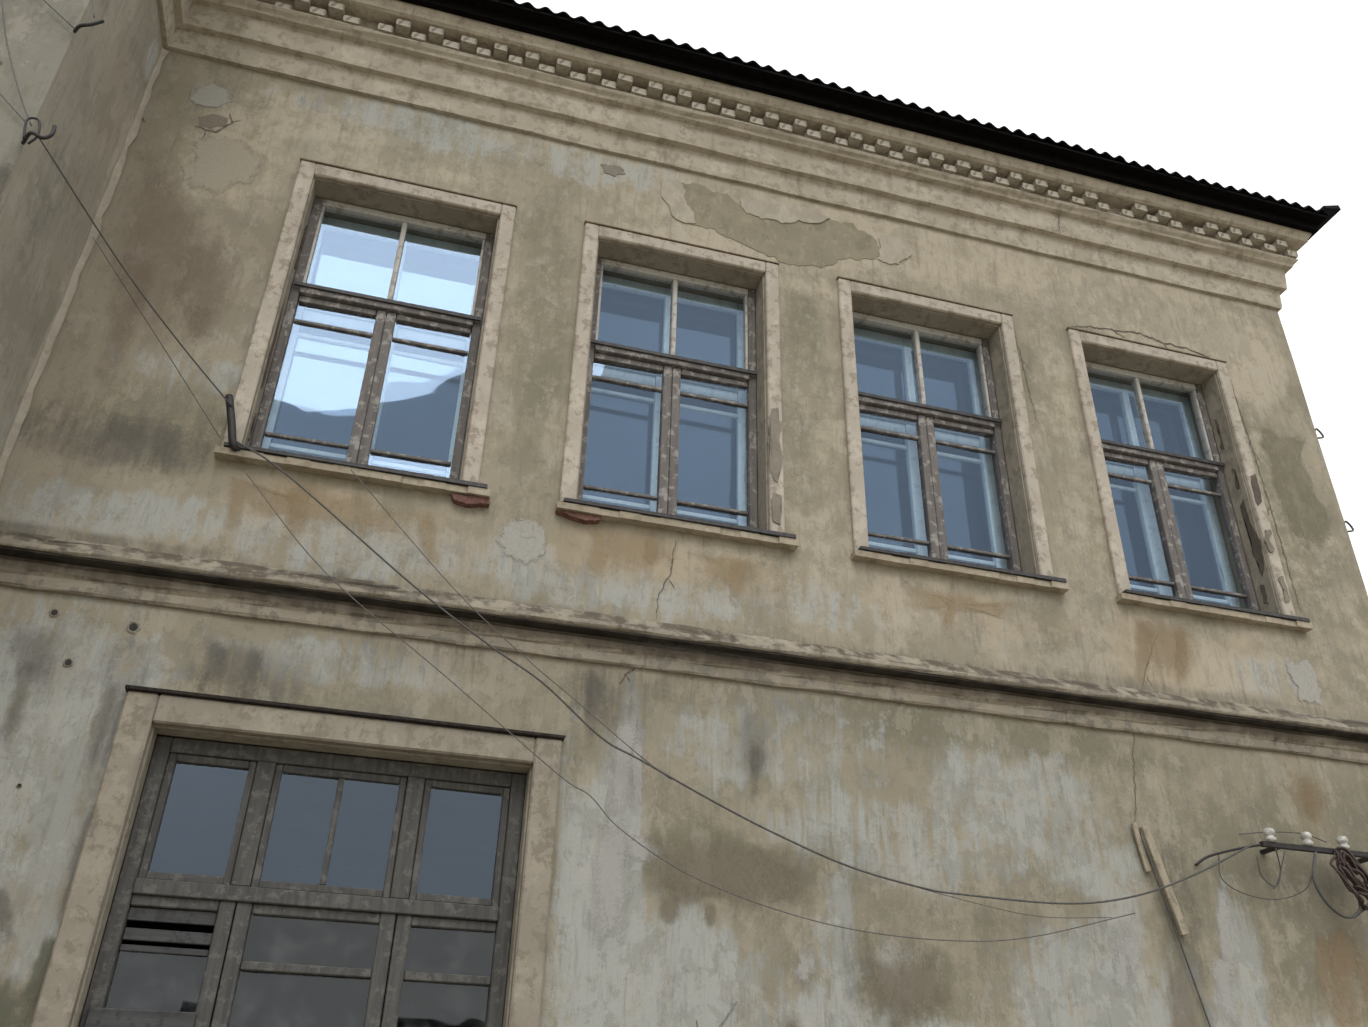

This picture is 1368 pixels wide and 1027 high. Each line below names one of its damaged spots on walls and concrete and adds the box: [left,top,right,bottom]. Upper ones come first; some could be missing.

peeling [190,84,230,128]
peeling [661,179,912,268]
flaking render [556,501,602,525]
peeling [496,519,546,566]
crack [656,541,676,619]
peeling [1287,659,1322,705]
leakage [595,723,796,935]